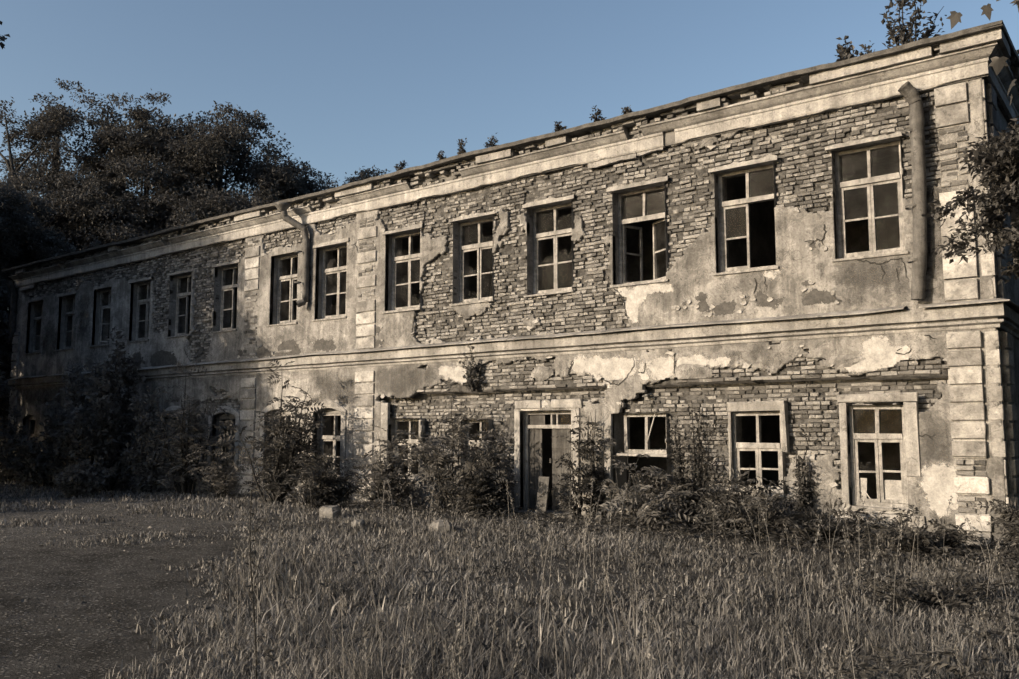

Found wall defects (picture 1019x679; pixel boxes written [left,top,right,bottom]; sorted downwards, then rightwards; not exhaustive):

flaking render [919,86,970,193]
flaking render [316,96,912,343]
peeling [134,349,177,368]
flaking render [25,228,303,362]
flaking render [237,293,336,359]
flaking render [380,335,950,510]